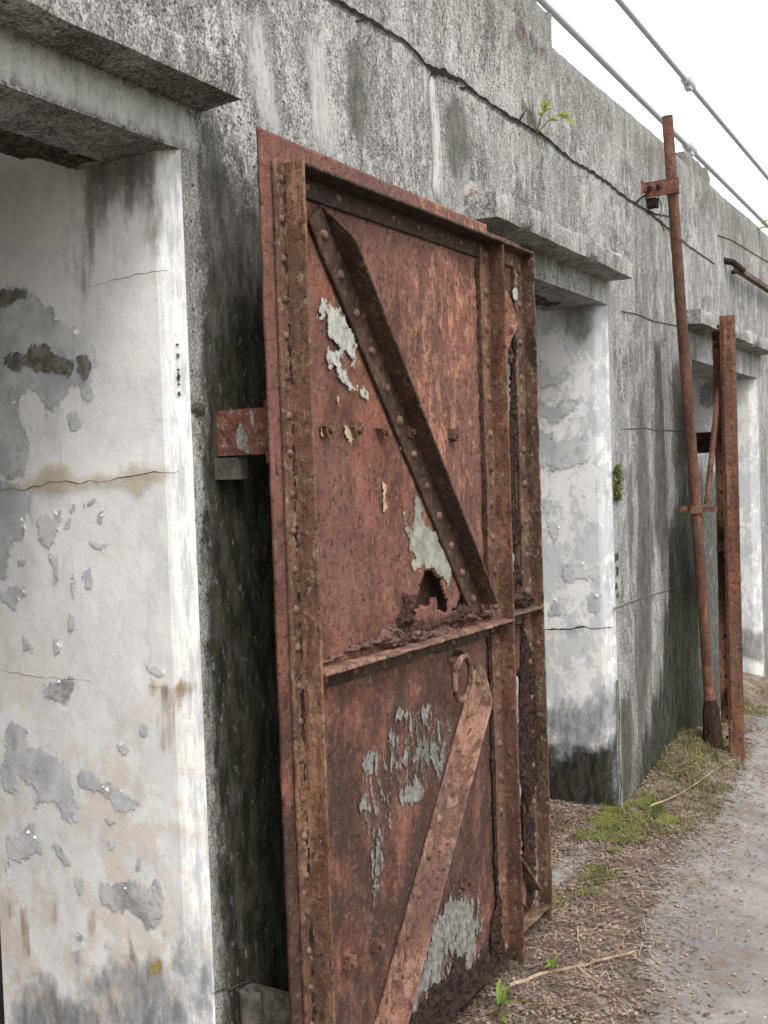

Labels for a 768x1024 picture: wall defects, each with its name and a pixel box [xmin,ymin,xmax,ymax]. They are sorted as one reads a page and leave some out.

efflorescence [308,36,333,151]
crack [328,0,768,264]
peeling [0,285,105,611]
crack [0,471,178,491]
damp [0,17,289,1024]
peeling [537,359,590,475]
peeling [562,560,603,617]
crack [545,585,680,630]
damp [547,343,721,806]
peeling [0,720,140,850]
peeling [3,822,70,873]
peeling [98,857,164,931]